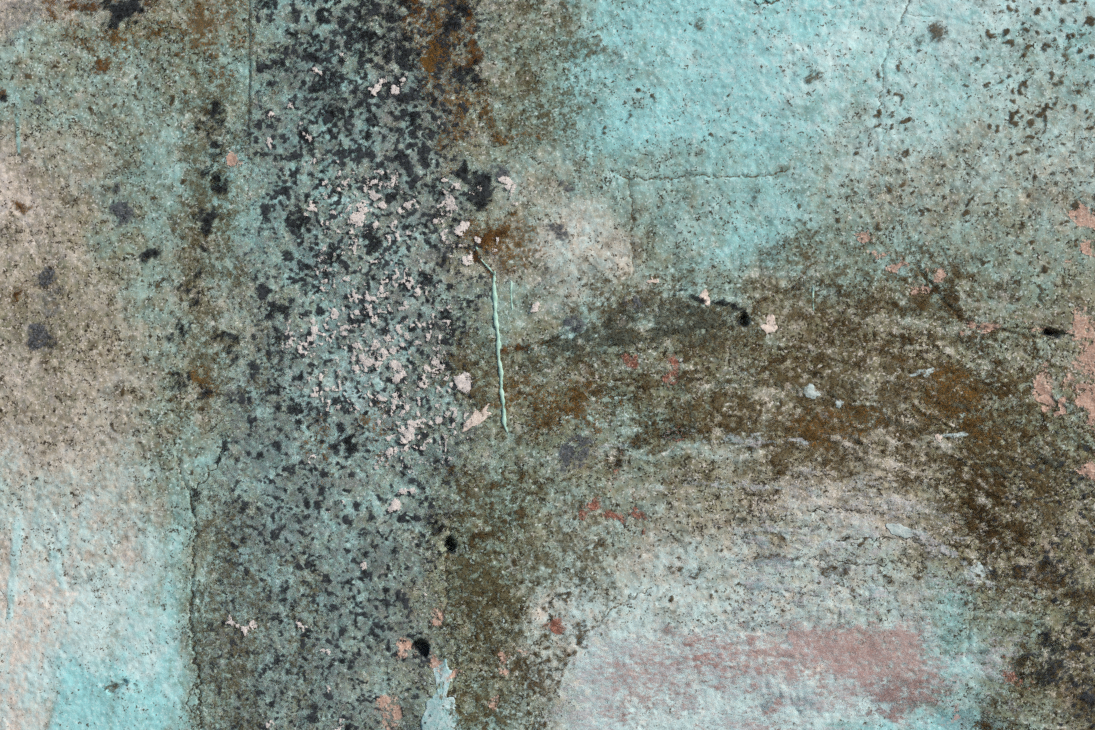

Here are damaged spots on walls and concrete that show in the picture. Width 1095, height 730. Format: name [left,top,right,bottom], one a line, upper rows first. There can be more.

damp [254,0,279,30]
damp [914,22,948,48]
rust [399,0,615,173]
flaking render [1060,201,1095,256]
flaking render [911,268,946,294]
flaking render [1015,306,1095,433]
peeling [461,403,492,433]
damp [214,432,245,464]
flaking render [1076,453,1095,479]
crack [177,440,223,730]
damp [387,646,432,700]
damp [533,619,908,730]